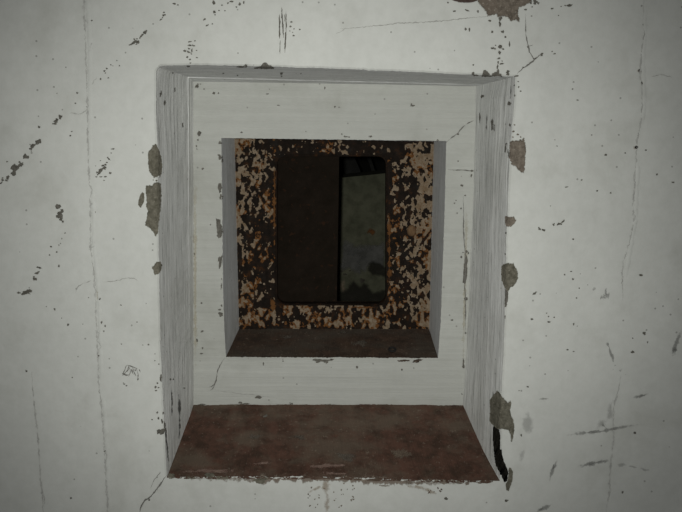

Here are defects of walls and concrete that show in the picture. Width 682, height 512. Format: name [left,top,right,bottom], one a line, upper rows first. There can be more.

spalling [472,0,539,105]
crack [517,16,556,74]
spalling [138,144,162,237]
corrosion [254,139,282,229]
spalling [504,124,526,173]
corrosion [238,206,432,329]
spalling [501,263,518,307]
crack [211,362,267,399]
crack [140,434,169,510]
spalling [489,390,522,491]